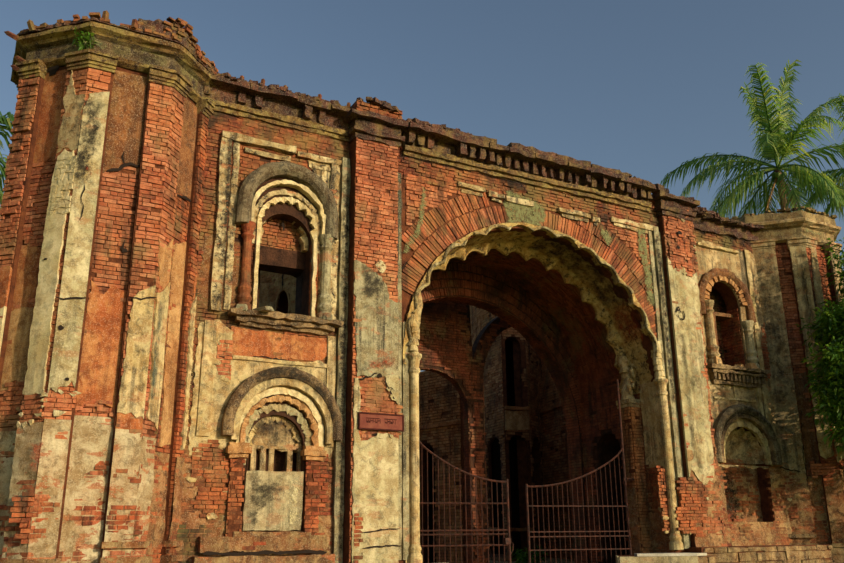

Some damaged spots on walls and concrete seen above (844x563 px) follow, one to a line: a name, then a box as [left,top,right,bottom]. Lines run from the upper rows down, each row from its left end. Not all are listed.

crack [107,151,140,171]
water stain [503,191,546,226]
peeling [666,219,699,277]
water stain [362,260,386,297]
water stain [256,177,350,500]
peeling [356,377,403,415]
peeling [0,379,334,563]
water stain [249,480,299,526]
peeling [643,449,844,553]
spalling [353,513,363,563]